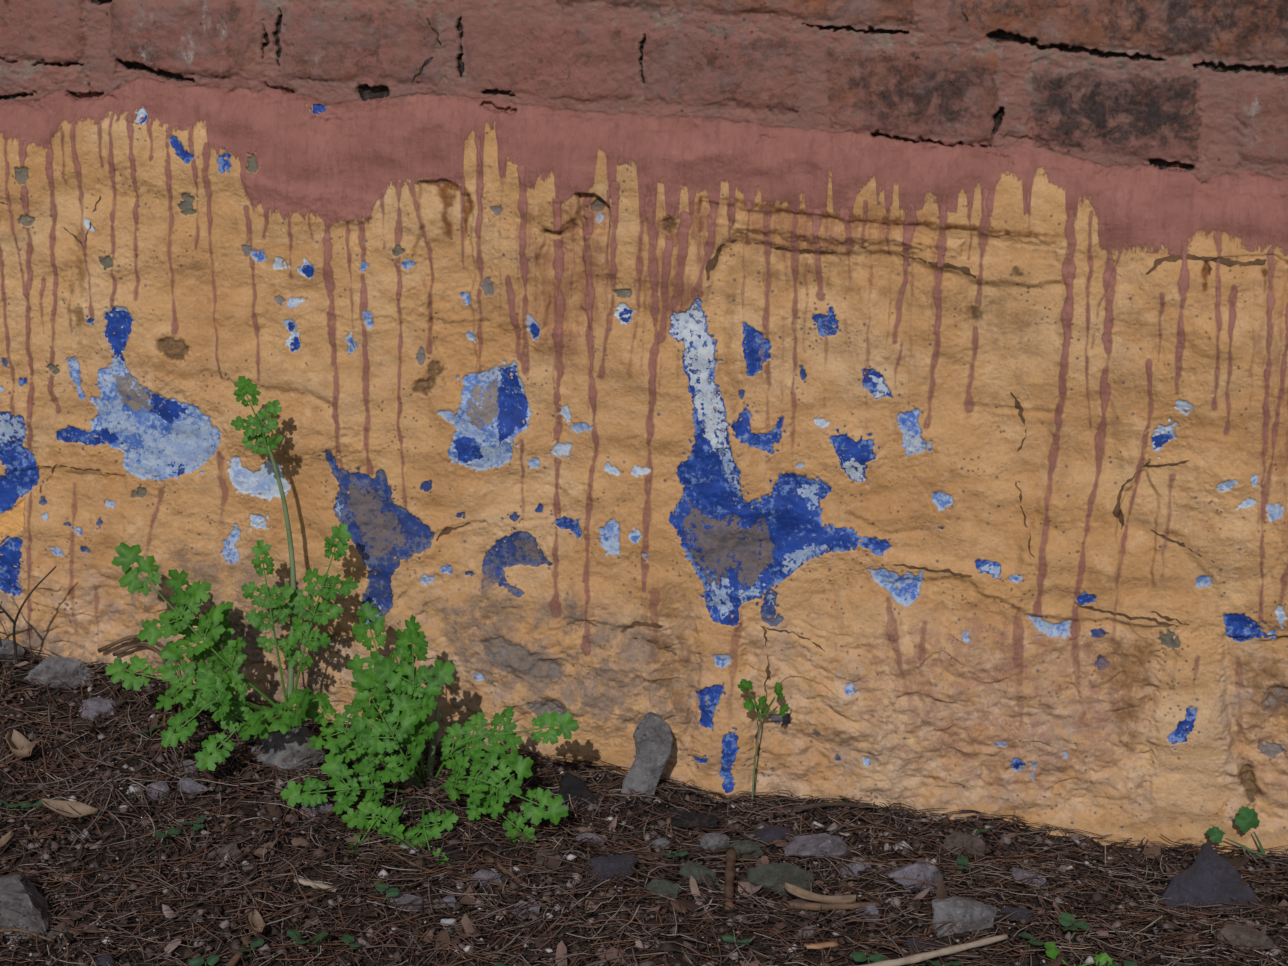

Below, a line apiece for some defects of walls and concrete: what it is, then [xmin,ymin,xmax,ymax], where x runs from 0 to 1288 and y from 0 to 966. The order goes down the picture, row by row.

peeling [0,358,27,392]
peeling [0,412,48,521]
peeling [56,306,291,564]
peeling [413,356,533,472]
peeling [528,405,593,468]
peeling [668,295,932,626]
peeling [0,536,26,597]
peeling [319,449,582,630]
peeling [597,518,648,561]
peeling [1223,605,1288,642]